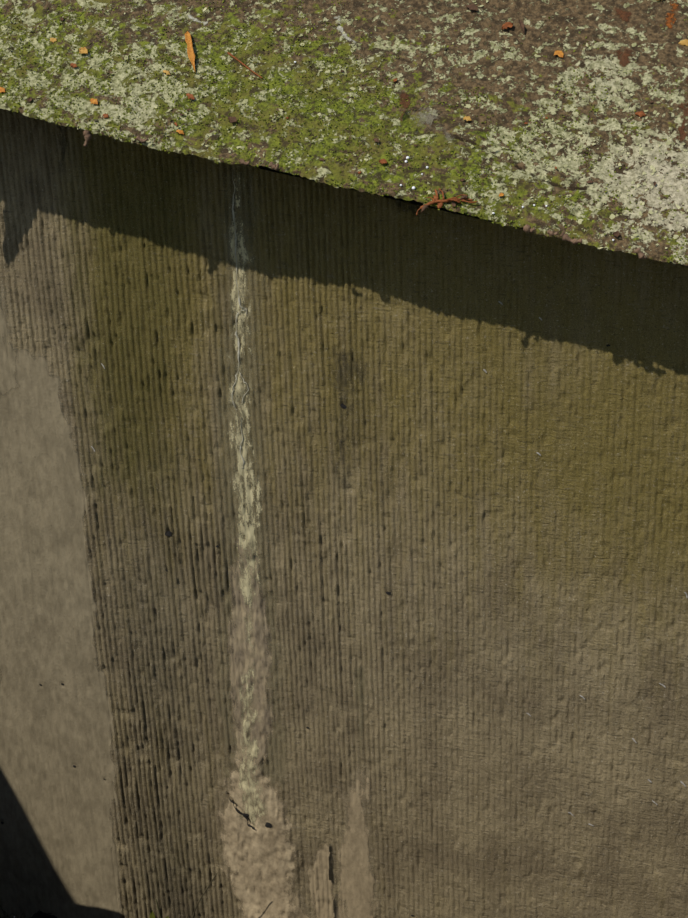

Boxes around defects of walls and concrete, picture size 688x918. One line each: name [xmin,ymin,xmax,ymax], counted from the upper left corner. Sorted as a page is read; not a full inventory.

water stain [225,177,277,827]